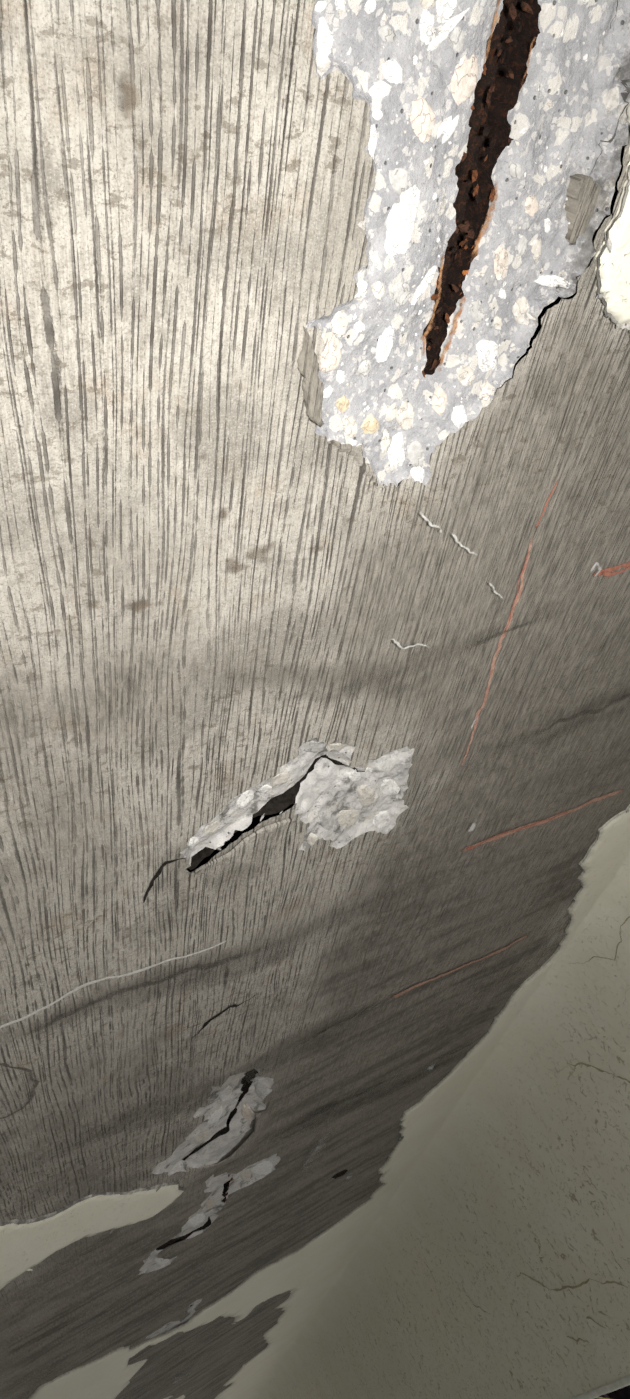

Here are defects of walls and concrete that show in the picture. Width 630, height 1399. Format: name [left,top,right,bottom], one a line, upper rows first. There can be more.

spalling [297,0,630,489]
rust [472,185,497,255]
rust [422,255,466,364]
rust [461,483,557,766]
rust [590,562,630,577]
spalling [180,737,414,866]
rust [462,789,624,852]
spalling [0,1068,280,1275]